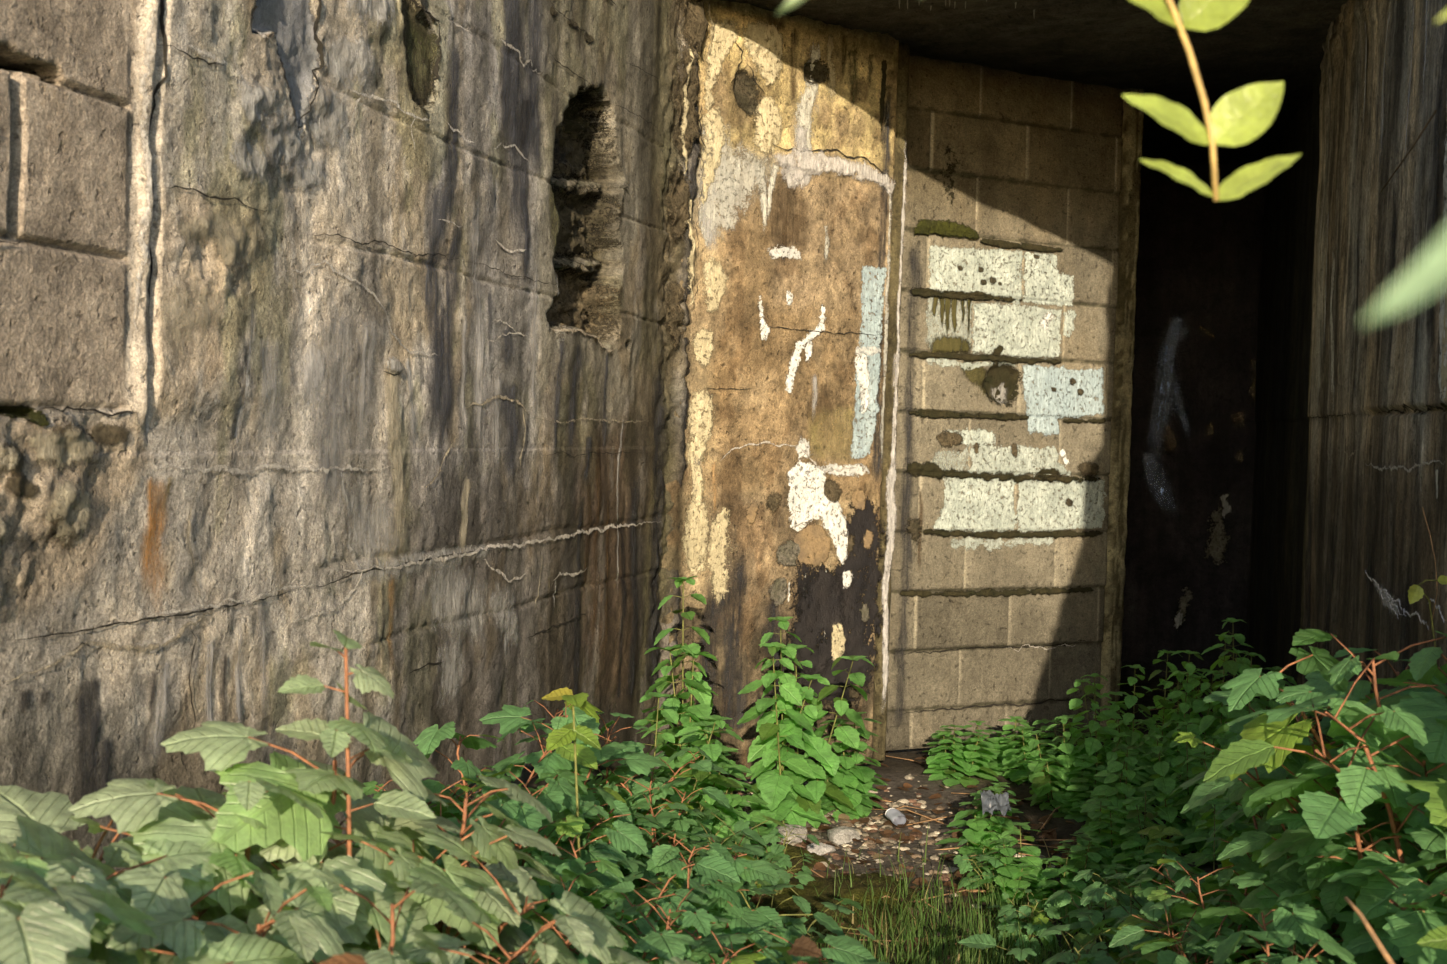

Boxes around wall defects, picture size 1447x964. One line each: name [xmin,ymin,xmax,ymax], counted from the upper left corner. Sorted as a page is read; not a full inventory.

crack [133,0,268,433]
crack [0,478,659,728]
flaking render [229,0,442,191]
damp [430,479,525,696]
damp [424,0,541,474]
damp [554,341,682,696]
damp [681,85,701,486]
peeling [682,386,874,606]
peeling [693,18,895,366]
peeling [785,304,827,410]
damp [700,93,923,729]
peeling [926,244,1107,551]